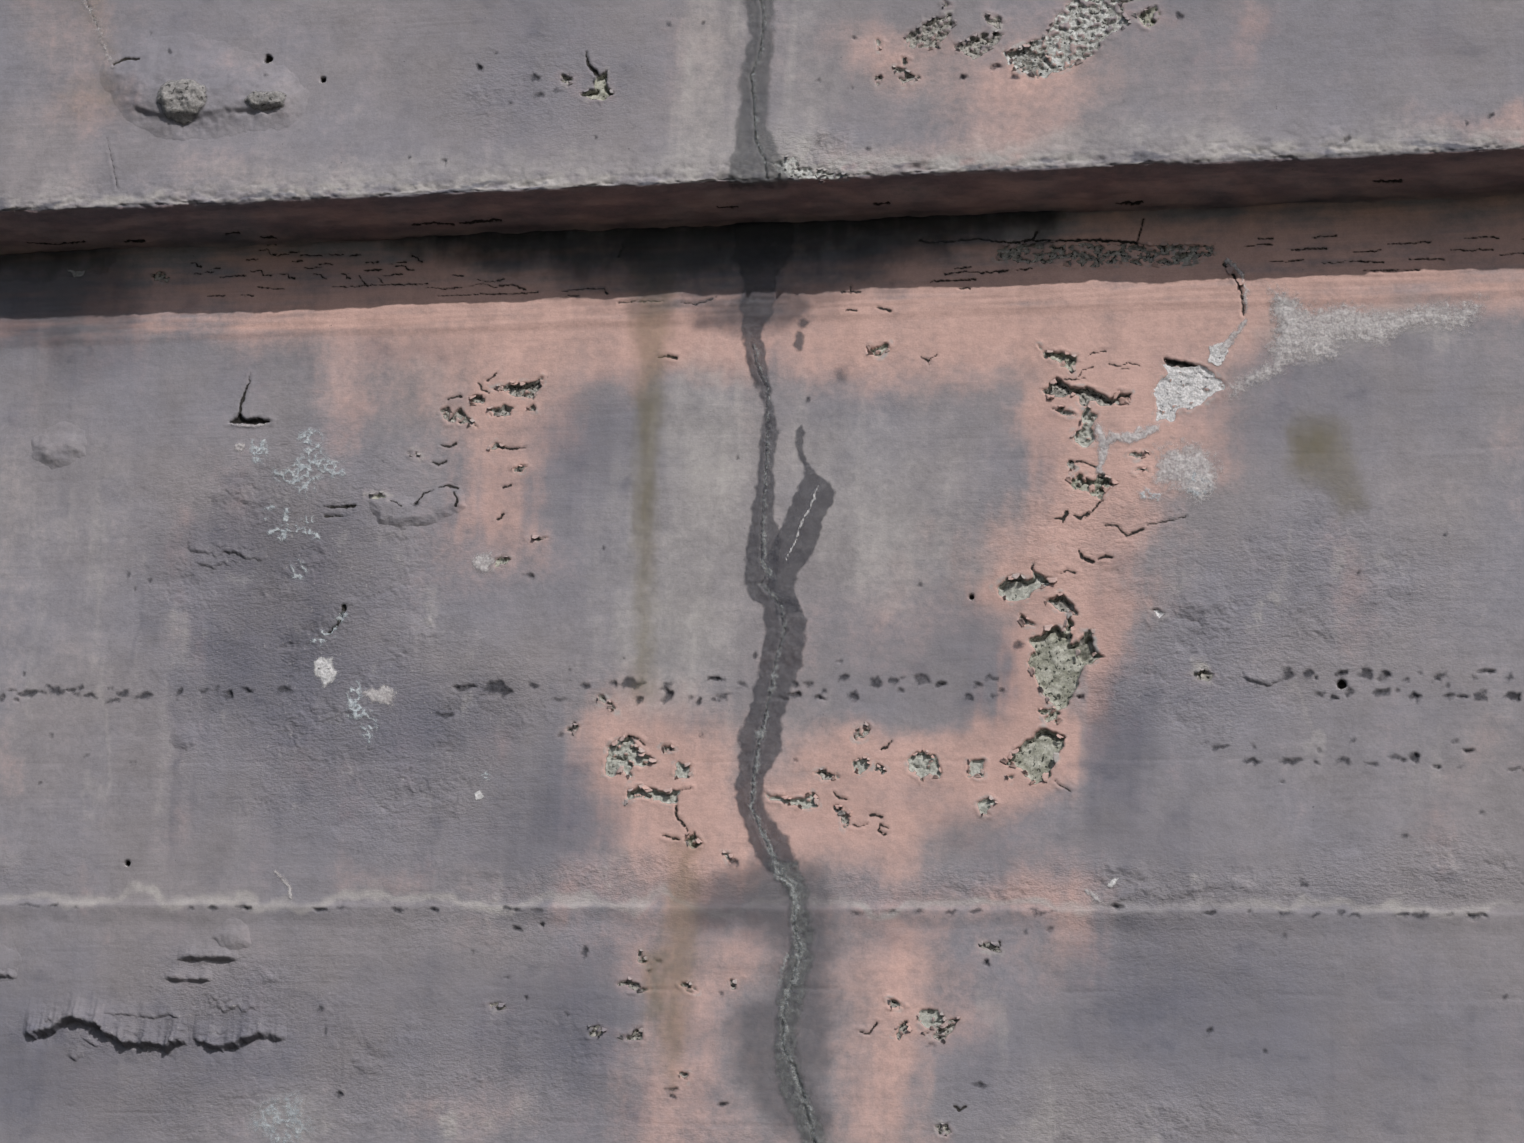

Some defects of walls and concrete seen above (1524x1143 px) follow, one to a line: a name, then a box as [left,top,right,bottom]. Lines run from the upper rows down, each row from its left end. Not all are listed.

crack [750,0,806,179]
peeling [874,0,1183,86]
peeling [995,241,1248,422]
water stain [1231,293,1482,396]
crack [230,379,270,427]
peeling [440,372,543,427]
peeling [1038,345,1131,517]
water stain [1095,424,1159,477]
water stain [1141,445,1221,502]
spalling [967,564,1103,792]
spalling [605,735,702,849]
peeling [766,740,892,836]